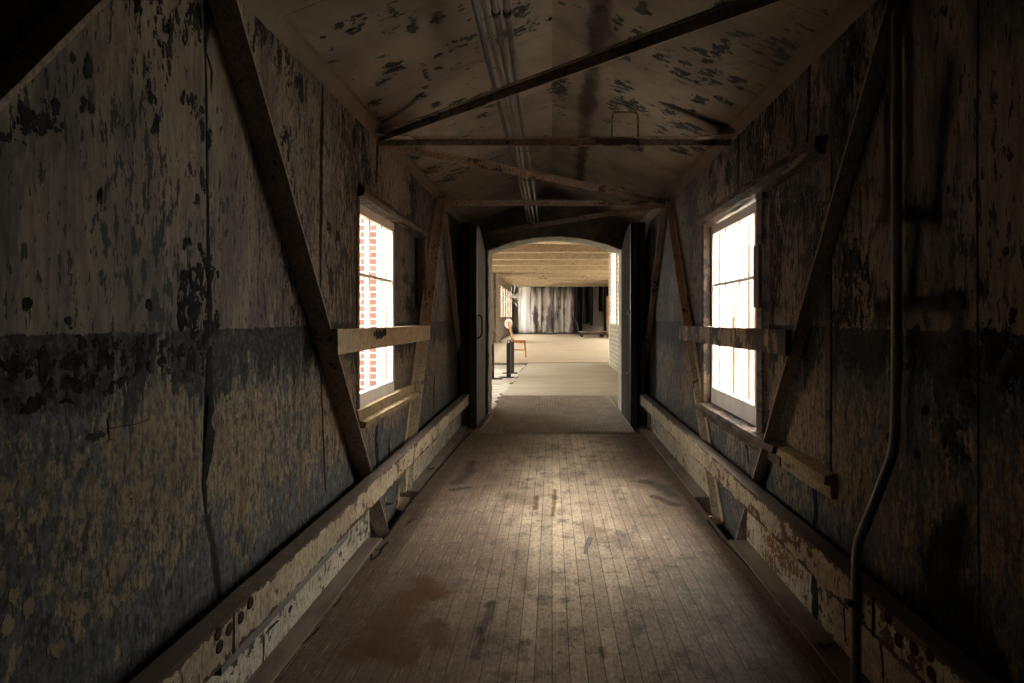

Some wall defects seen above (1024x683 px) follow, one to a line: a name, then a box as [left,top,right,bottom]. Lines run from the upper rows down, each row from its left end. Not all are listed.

peeling [69,52,94,79]
peeling [134,0,202,135]
peeling [248,16,307,104]
peeling [319,13,368,51]
peeling [368,34,485,109]
peeling [494,0,547,45]
peeling [606,39,747,117]
peeling [0,94,65,147]
peeling [181,90,212,150]
peeling [187,152,207,206]
peeling [0,236,220,415]